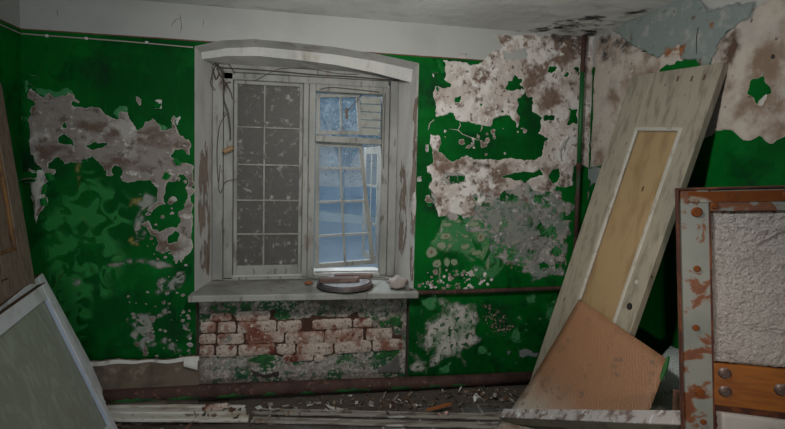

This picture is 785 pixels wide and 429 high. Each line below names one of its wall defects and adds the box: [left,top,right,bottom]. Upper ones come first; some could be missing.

peeling [21,75,211,276]
peeling [399,0,785,281]
flaking render [199,309,402,363]
peeling [507,328,538,358]